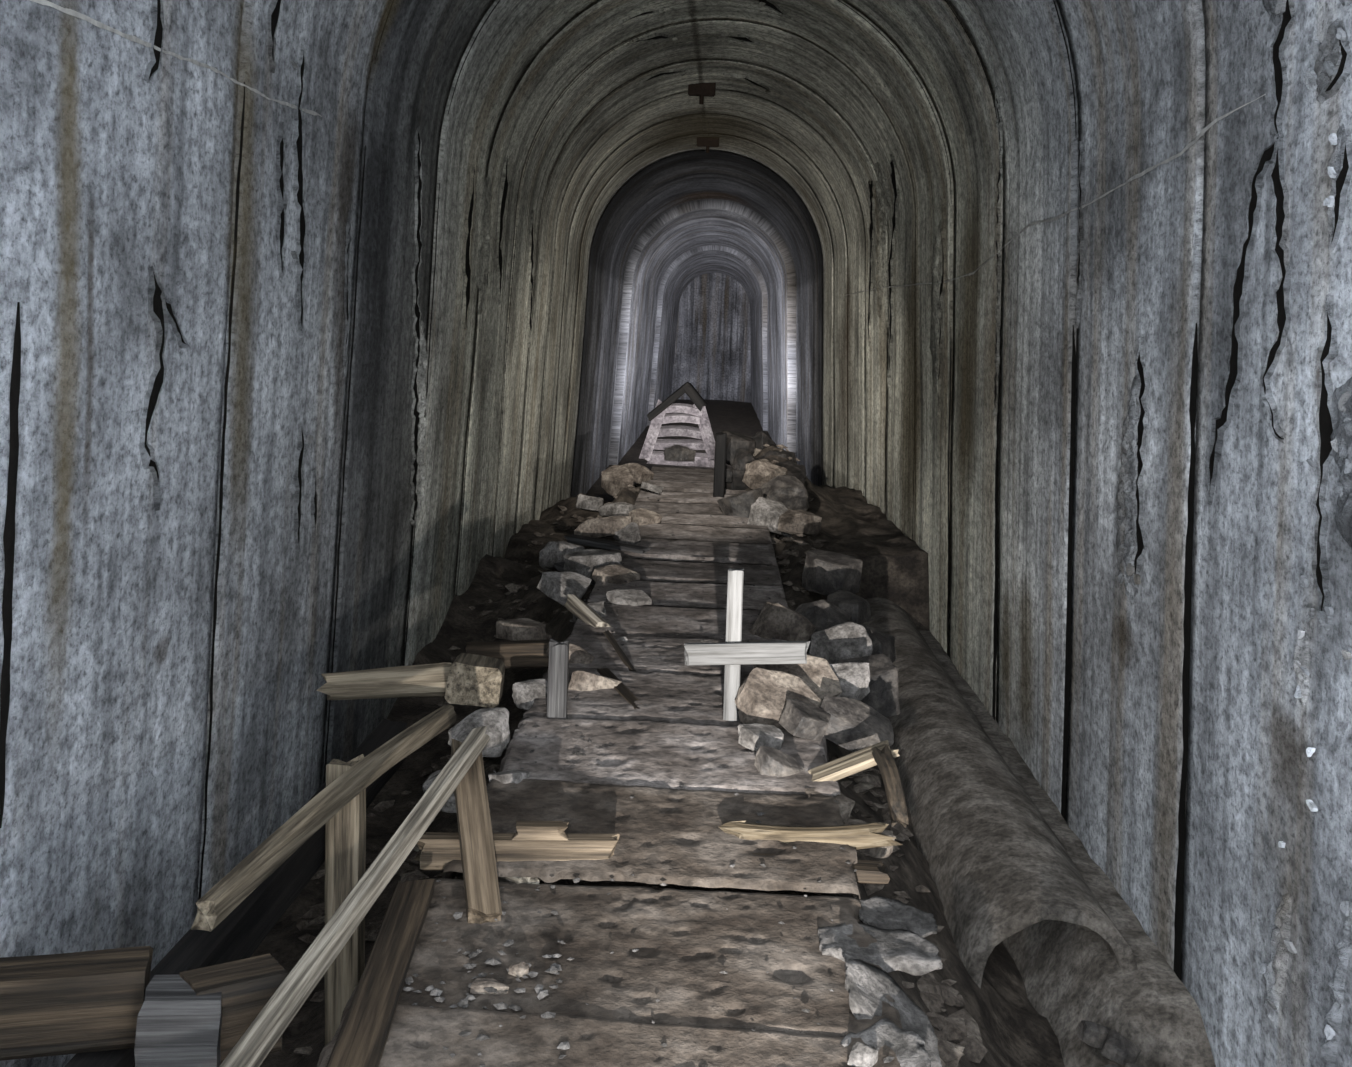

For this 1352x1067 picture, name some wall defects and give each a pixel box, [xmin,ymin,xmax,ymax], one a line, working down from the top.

crack [30,0,322,117]
spalling [1305,0,1352,104]
crack [139,265,189,511]
crack [844,0,1338,630]
spalling [1331,377,1352,549]